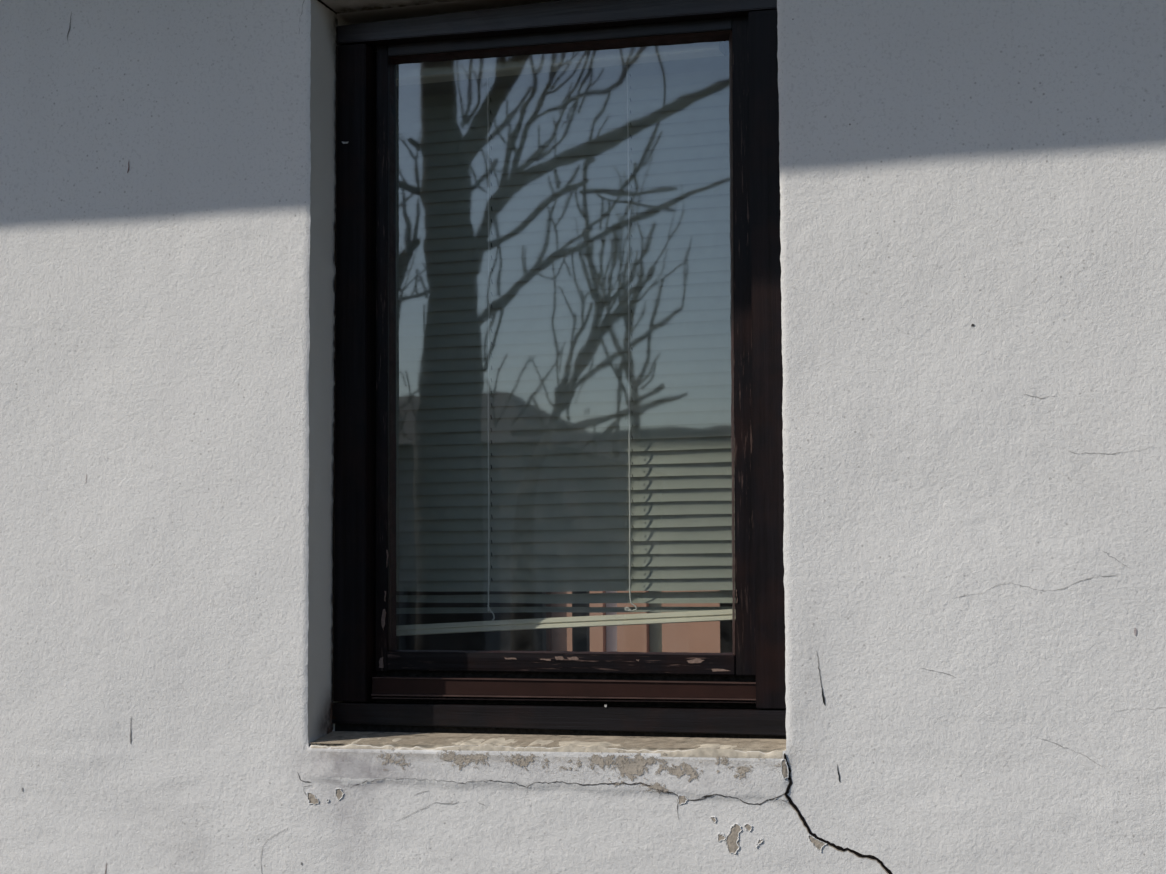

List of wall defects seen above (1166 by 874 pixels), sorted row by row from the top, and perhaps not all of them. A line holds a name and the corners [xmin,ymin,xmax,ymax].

peeling [378,748,410,770]
peeling [437,747,789,805]
crack [357,753,892,874]
flaking render [710,816,764,854]